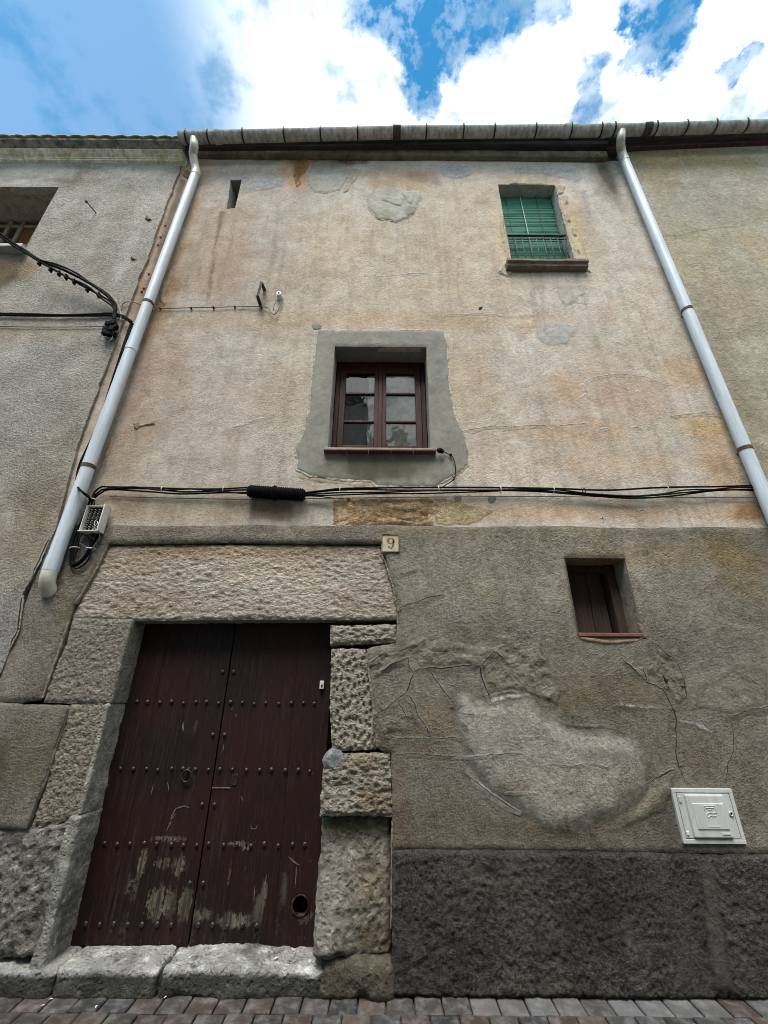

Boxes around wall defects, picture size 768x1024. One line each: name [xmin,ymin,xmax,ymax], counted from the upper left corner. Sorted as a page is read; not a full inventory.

spalling [301,477,491,526]
crack [367,650,537,816]
crack [552,709,618,770]
crack [619,641,690,788]